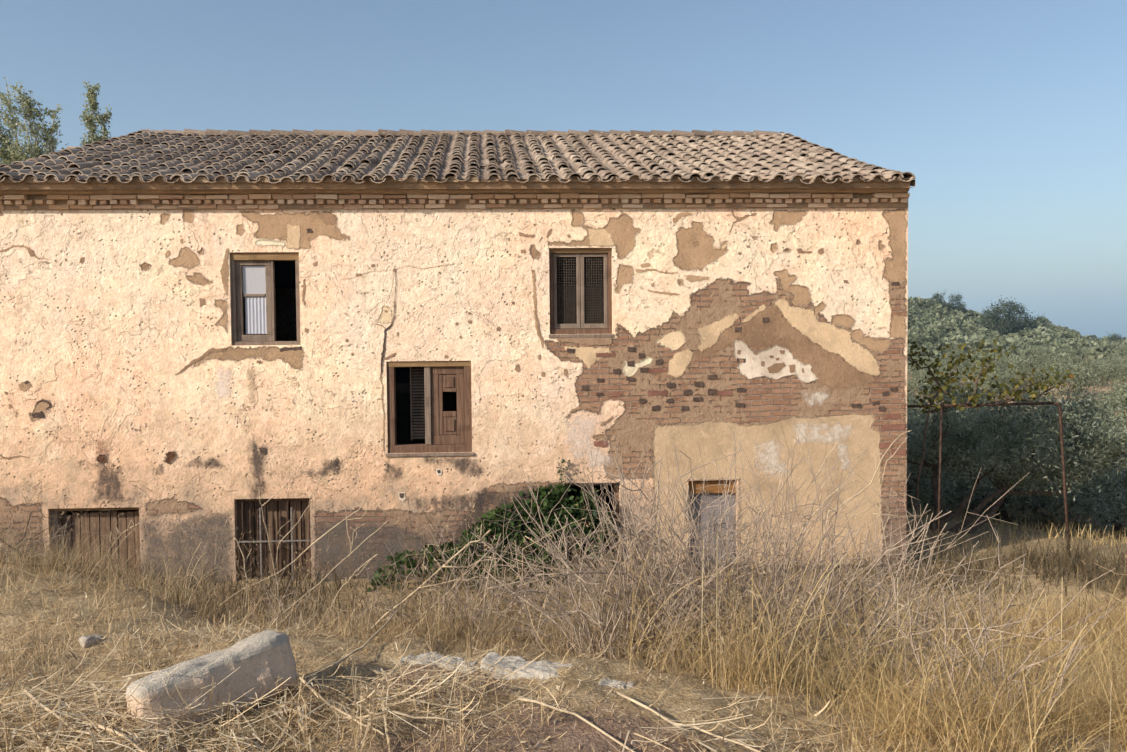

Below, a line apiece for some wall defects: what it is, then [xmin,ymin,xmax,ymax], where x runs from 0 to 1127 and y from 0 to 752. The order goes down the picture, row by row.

peeling [236,210,350,250]
peeling [165,239,229,332]
flaking render [5,382,52,422]
spalling [175,346,305,375]
crack [347,264,452,452]
flaking render [519,208,908,570]
damp [251,443,266,496]
damp [308,459,340,475]
damp [425,457,481,474]
damp [0,497,43,564]
damp [144,498,230,585]
damp [313,481,563,582]